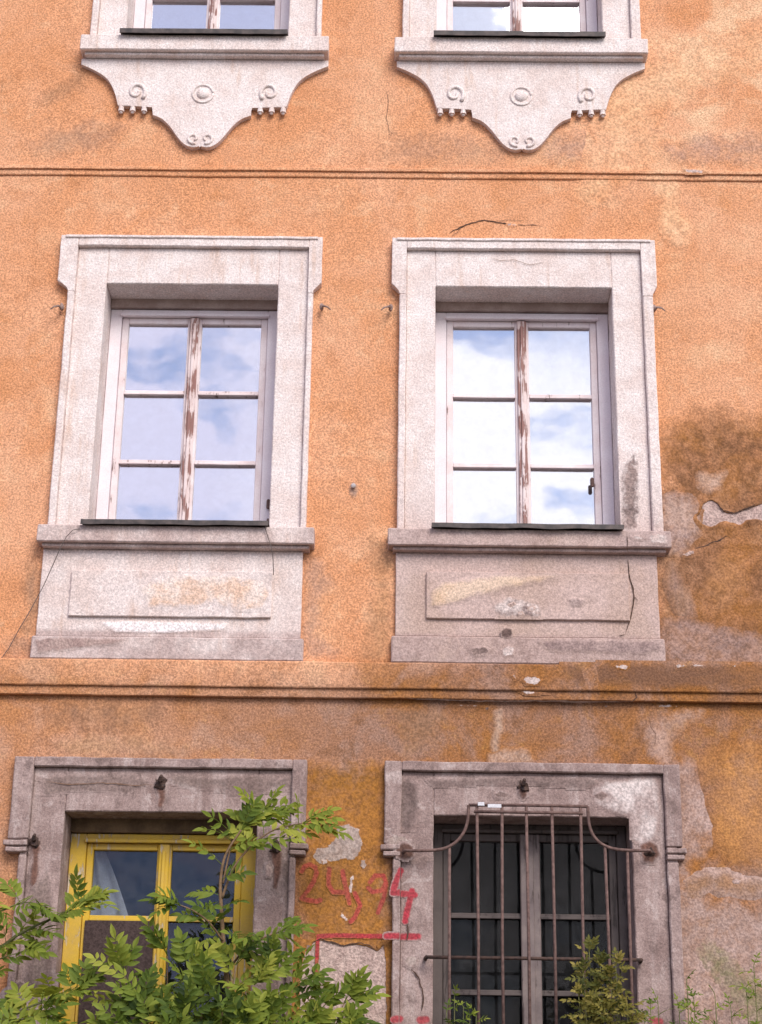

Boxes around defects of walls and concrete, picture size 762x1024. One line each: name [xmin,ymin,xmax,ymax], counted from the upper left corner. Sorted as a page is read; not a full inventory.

crack [449,219,540,234]
flaking render [693,468,762,535]
leakage [537,398,762,691]
peeling [487,596,543,620]
crack [619,538,638,636]
flaking render [509,673,552,696]
flaking render [312,823,368,894]
corrosion [639,841,661,865]
peeling [590,703,762,1024]
flaking render [291,936,424,1024]